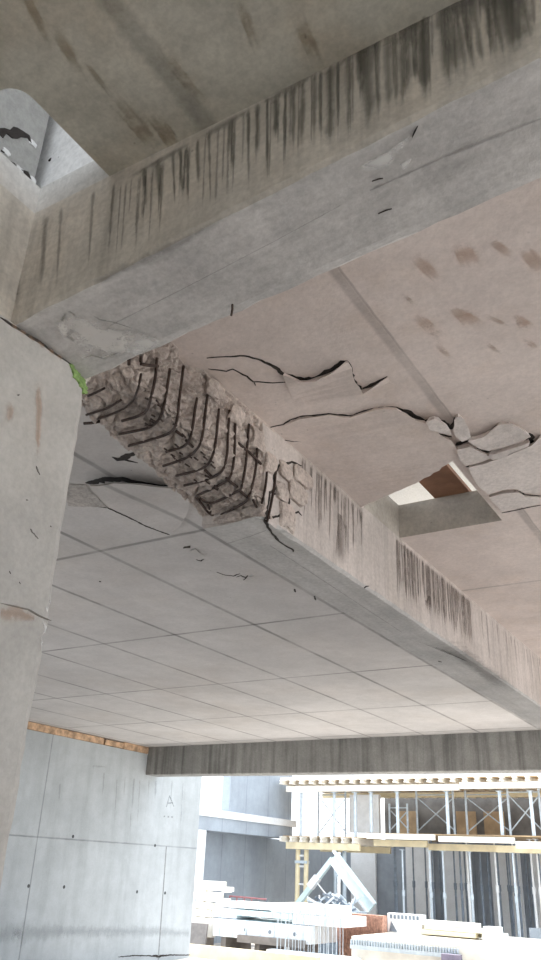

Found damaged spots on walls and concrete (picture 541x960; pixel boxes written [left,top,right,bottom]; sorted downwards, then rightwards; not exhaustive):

leakage [440,0,529,66]
leakage [247,18,426,163]
spalling [0,127,37,184]
leakage [172,138,210,194]
crack [67,452,189,535]
spalling [59,314,314,535]
leakage [302,461,362,543]
crack [209,355,541,552]
leakage [396,541,472,634]